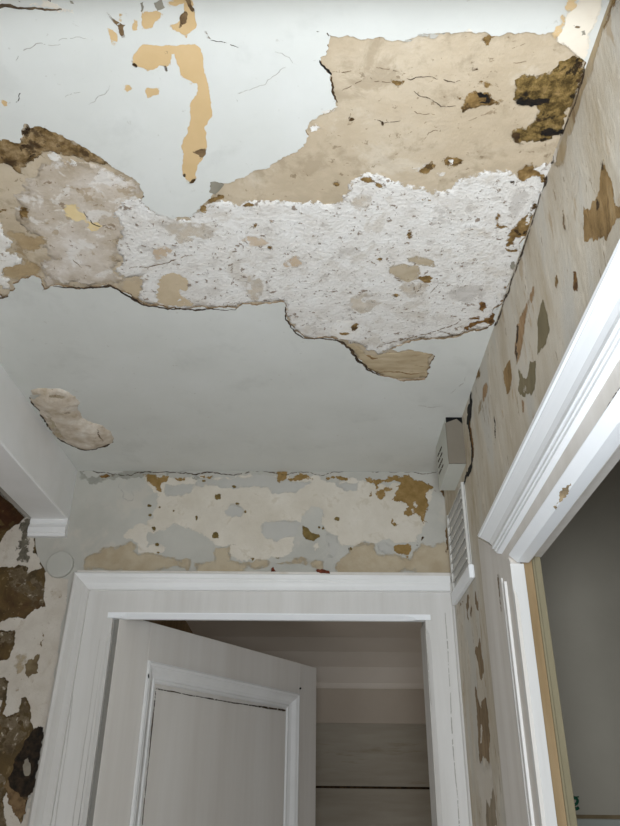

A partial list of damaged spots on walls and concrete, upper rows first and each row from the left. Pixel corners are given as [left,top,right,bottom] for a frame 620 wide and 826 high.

crack [0,0,74,14]
damp [554,0,616,166]
flaking render [0,0,602,380]
damp [510,162,546,184]
peeling [583,159,620,242]
peeling [503,300,550,397]
peeling [123,471,444,562]
peeling [553,484,571,509]
flaking render [0,517,69,826]